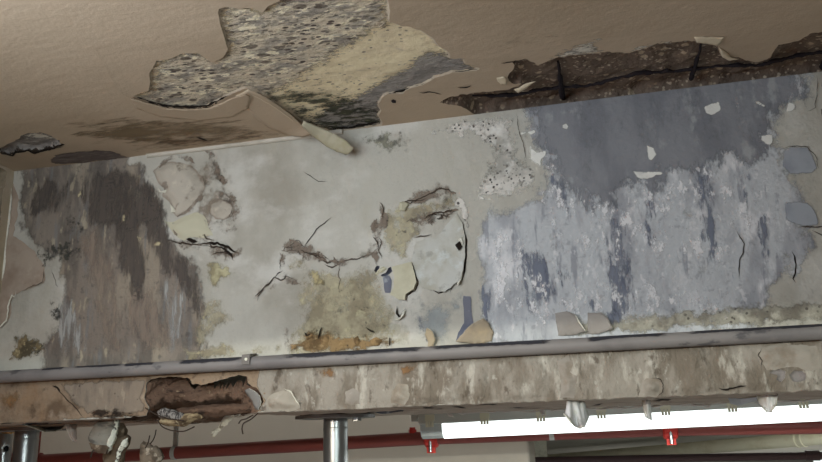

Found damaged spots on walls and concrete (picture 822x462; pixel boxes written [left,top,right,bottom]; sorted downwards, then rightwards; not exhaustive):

peeling [95,0,480,155]
peeling [0,168,58,328]
spalling [0,132,128,164]
water stain [9,157,242,370]
water stain [74,120,234,148]
peeling [163,212,213,241]
flaking render [207,262,230,286]
crack [255,187,458,296]
peeling [383,198,469,300]
peeling [440,32,822,344]
peeling [0,340,822,438]